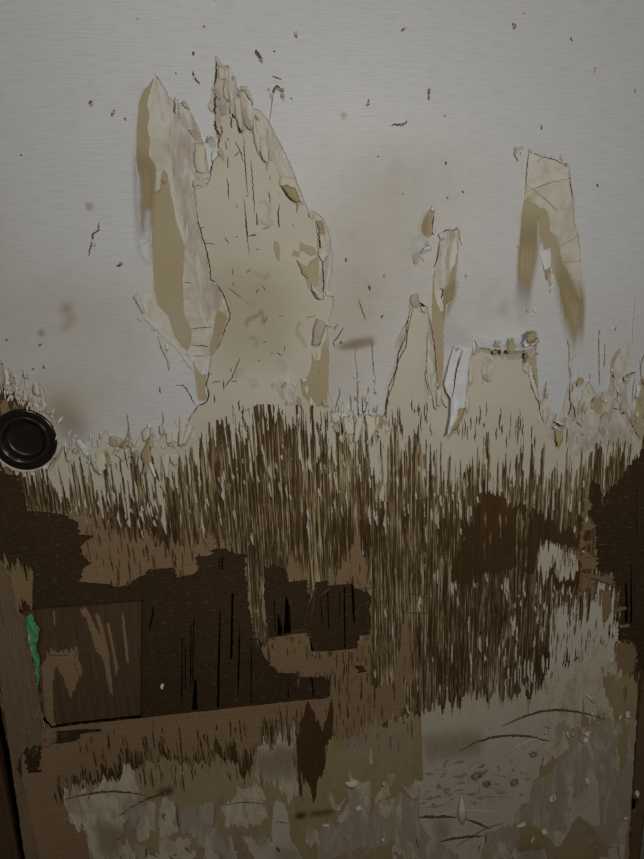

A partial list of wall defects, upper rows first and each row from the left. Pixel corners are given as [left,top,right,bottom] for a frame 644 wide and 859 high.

peeling [133,56,344,427]
peeling [383,206,644,456]
peeling [517,148,584,338]
leakage [39,647,83,726]
leakage [79,607,129,697]